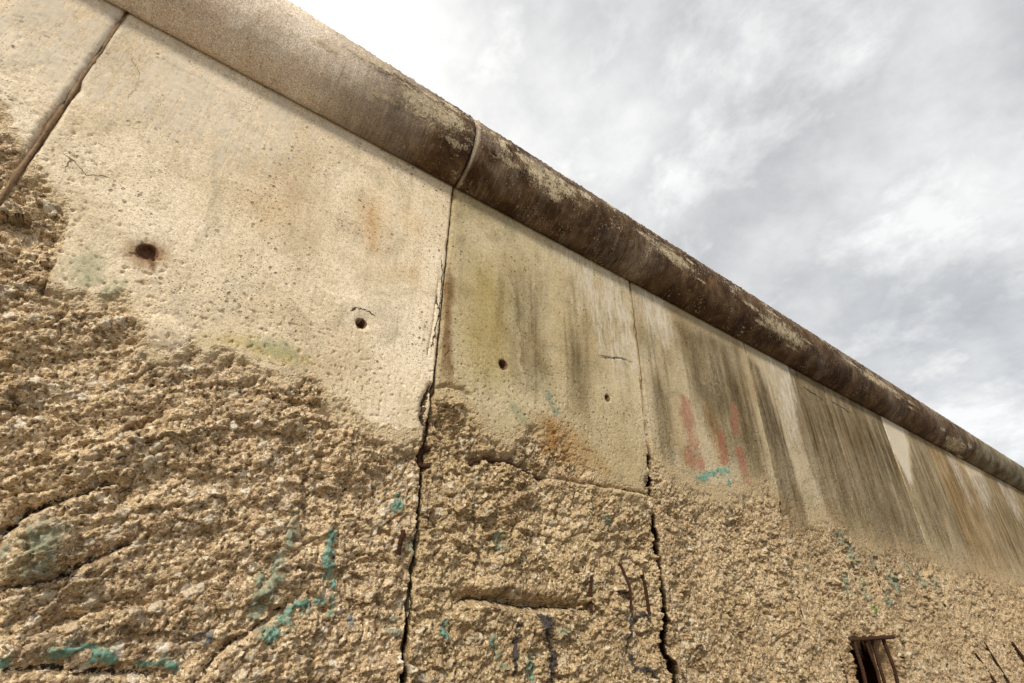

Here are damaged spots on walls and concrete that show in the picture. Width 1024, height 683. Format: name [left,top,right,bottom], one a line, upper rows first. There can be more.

spalling [0,101,27,193]
crack [419,260,443,429]
spalling [0,160,1024,683]
leakage [768,355,798,436]
leakage [880,415,911,484]
rust [849,641,882,683]